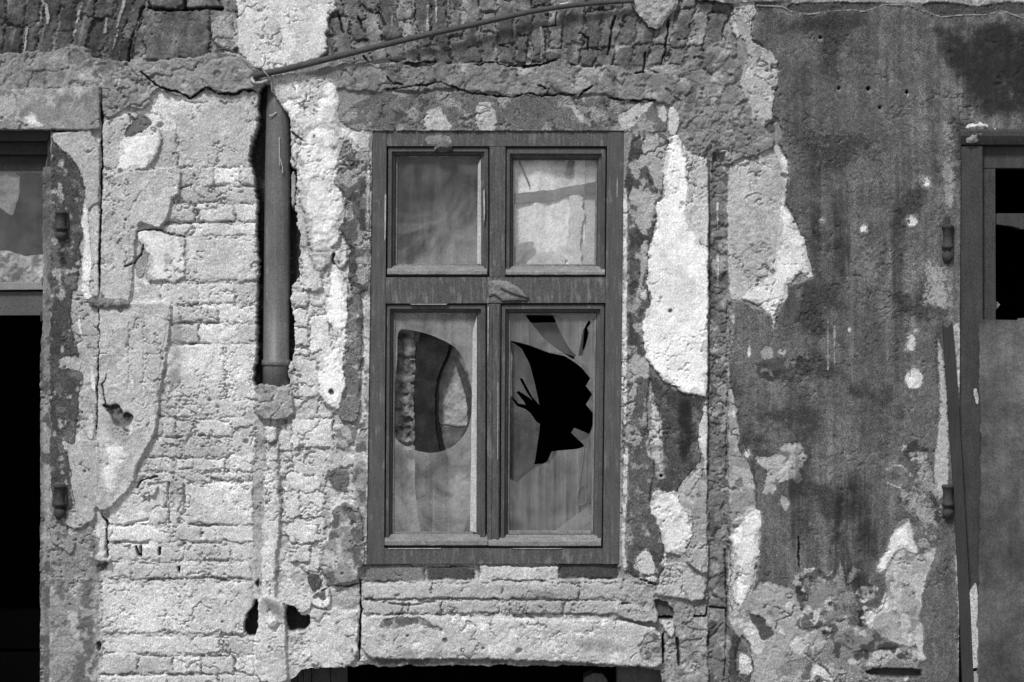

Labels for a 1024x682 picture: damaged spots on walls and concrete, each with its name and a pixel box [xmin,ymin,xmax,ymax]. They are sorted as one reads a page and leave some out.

crack [141,72,255,99]
crack [386,60,656,103]
leakage [936,23,1024,115]
peeling [105,114,162,178]
leakage [939,99,982,209]
peeling [136,230,185,283]
spalling [726,146,814,329]
leakage [836,239,882,290]
leakage [923,259,952,311]
leakage [827,320,836,370]
flaking render [727,388,945,682]
spalling [245,599,259,635]